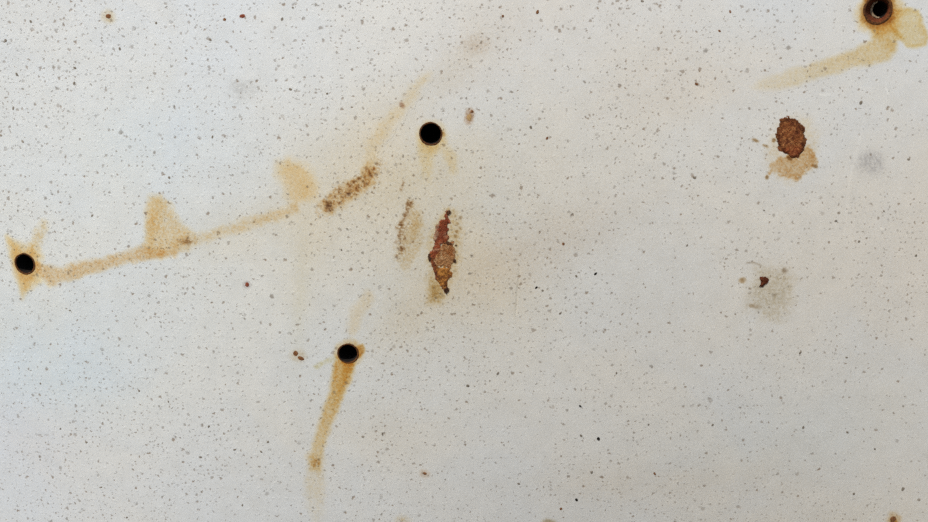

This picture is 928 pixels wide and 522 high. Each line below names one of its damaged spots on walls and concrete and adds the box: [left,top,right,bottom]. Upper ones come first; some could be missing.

rust [748,0,928,94]
rust [2,67,435,303]
rust [390,179,468,310]
rust [413,117,461,185]
rust [750,109,826,190]
rust [287,336,367,522]